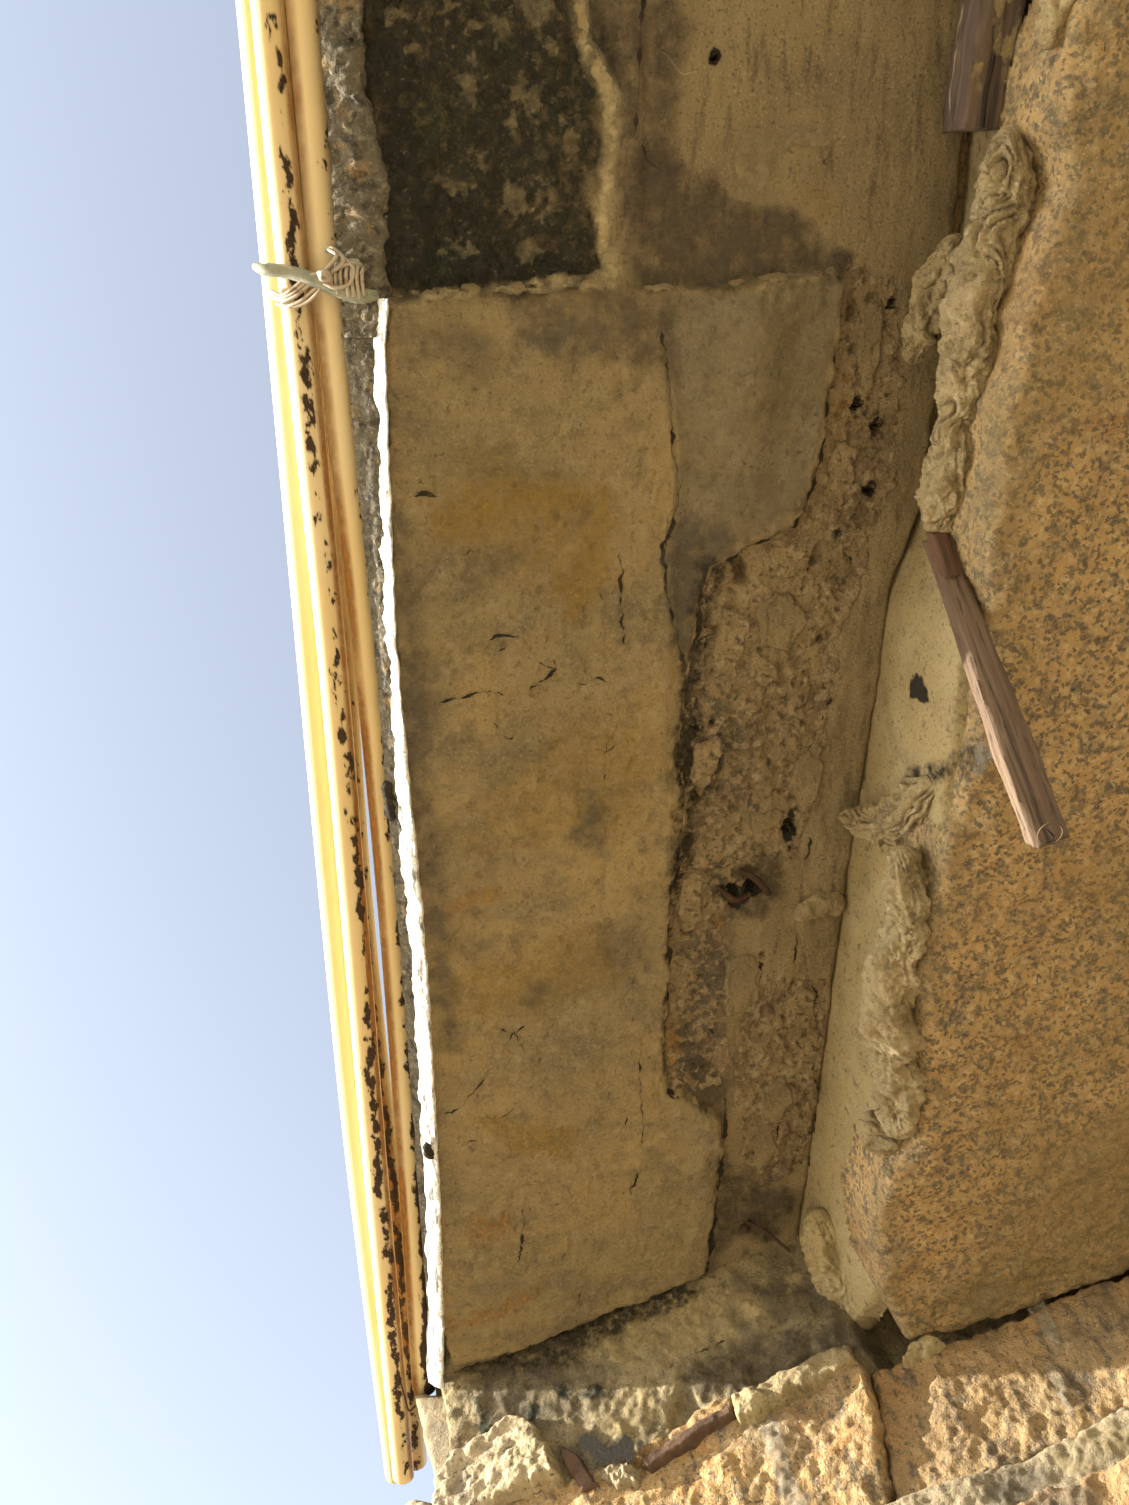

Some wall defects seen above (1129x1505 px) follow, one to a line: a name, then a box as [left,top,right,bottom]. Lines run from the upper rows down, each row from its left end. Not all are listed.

water stain [362,0,851,299]
corrosion [317,325,435,1395]
spalling [664,258,907,1186]
water stain [487,1364,570,1421]
water stain [684,1288,881,1395]